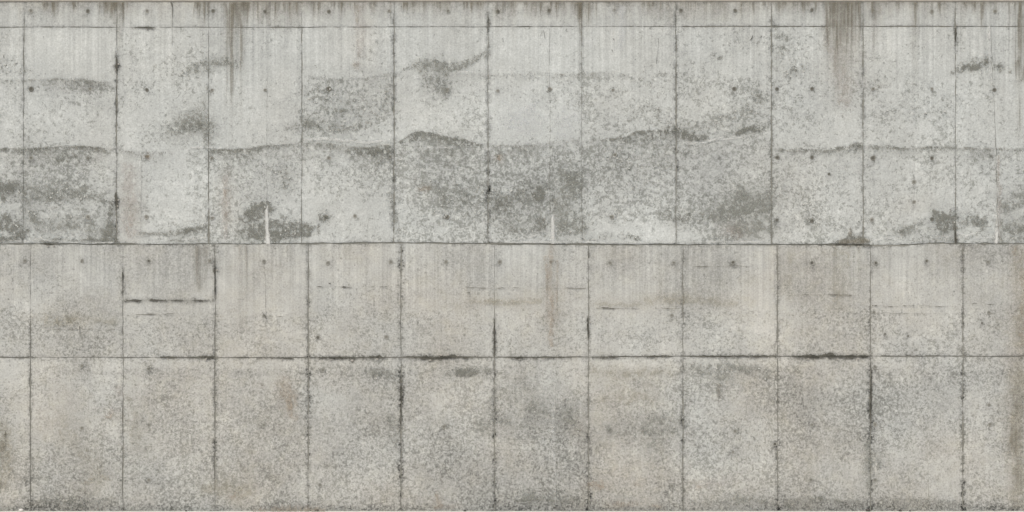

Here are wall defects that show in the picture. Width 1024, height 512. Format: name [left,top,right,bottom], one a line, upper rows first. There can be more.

water stain [169,102,290,164]
water stain [238,200,331,244]